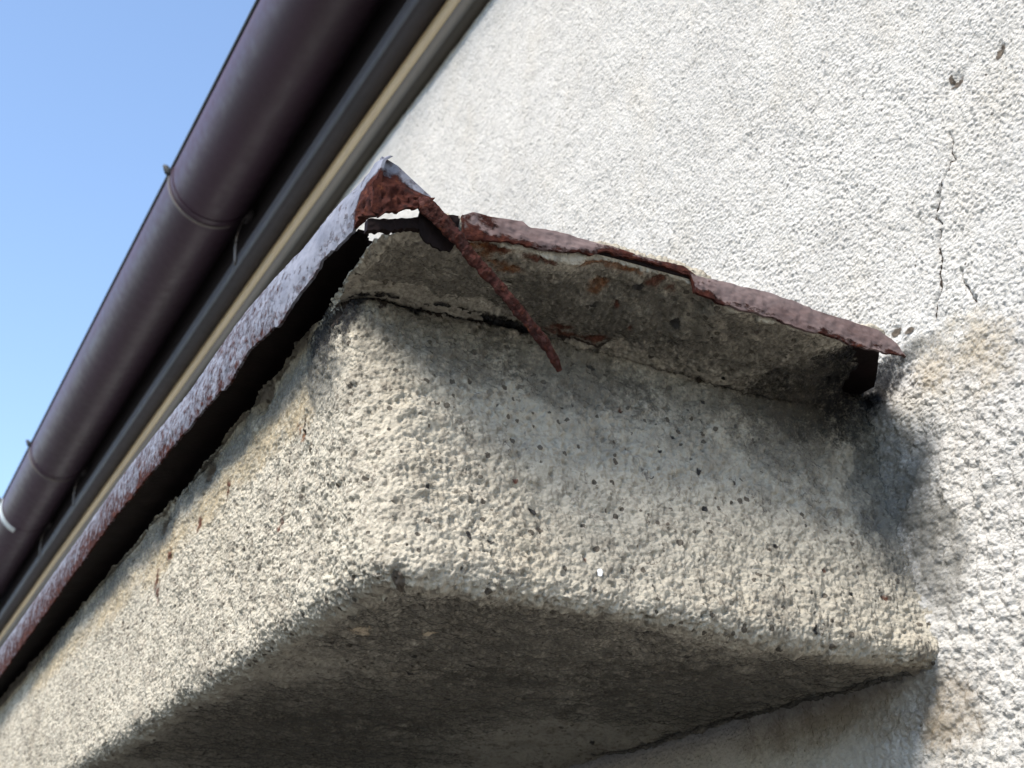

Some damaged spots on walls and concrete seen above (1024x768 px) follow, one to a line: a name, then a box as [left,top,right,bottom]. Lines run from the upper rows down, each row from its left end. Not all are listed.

crack [329,292,612,348]
rust [470,242,557,272]
crack [935,134,977,319]
leakage [645,340,965,602]